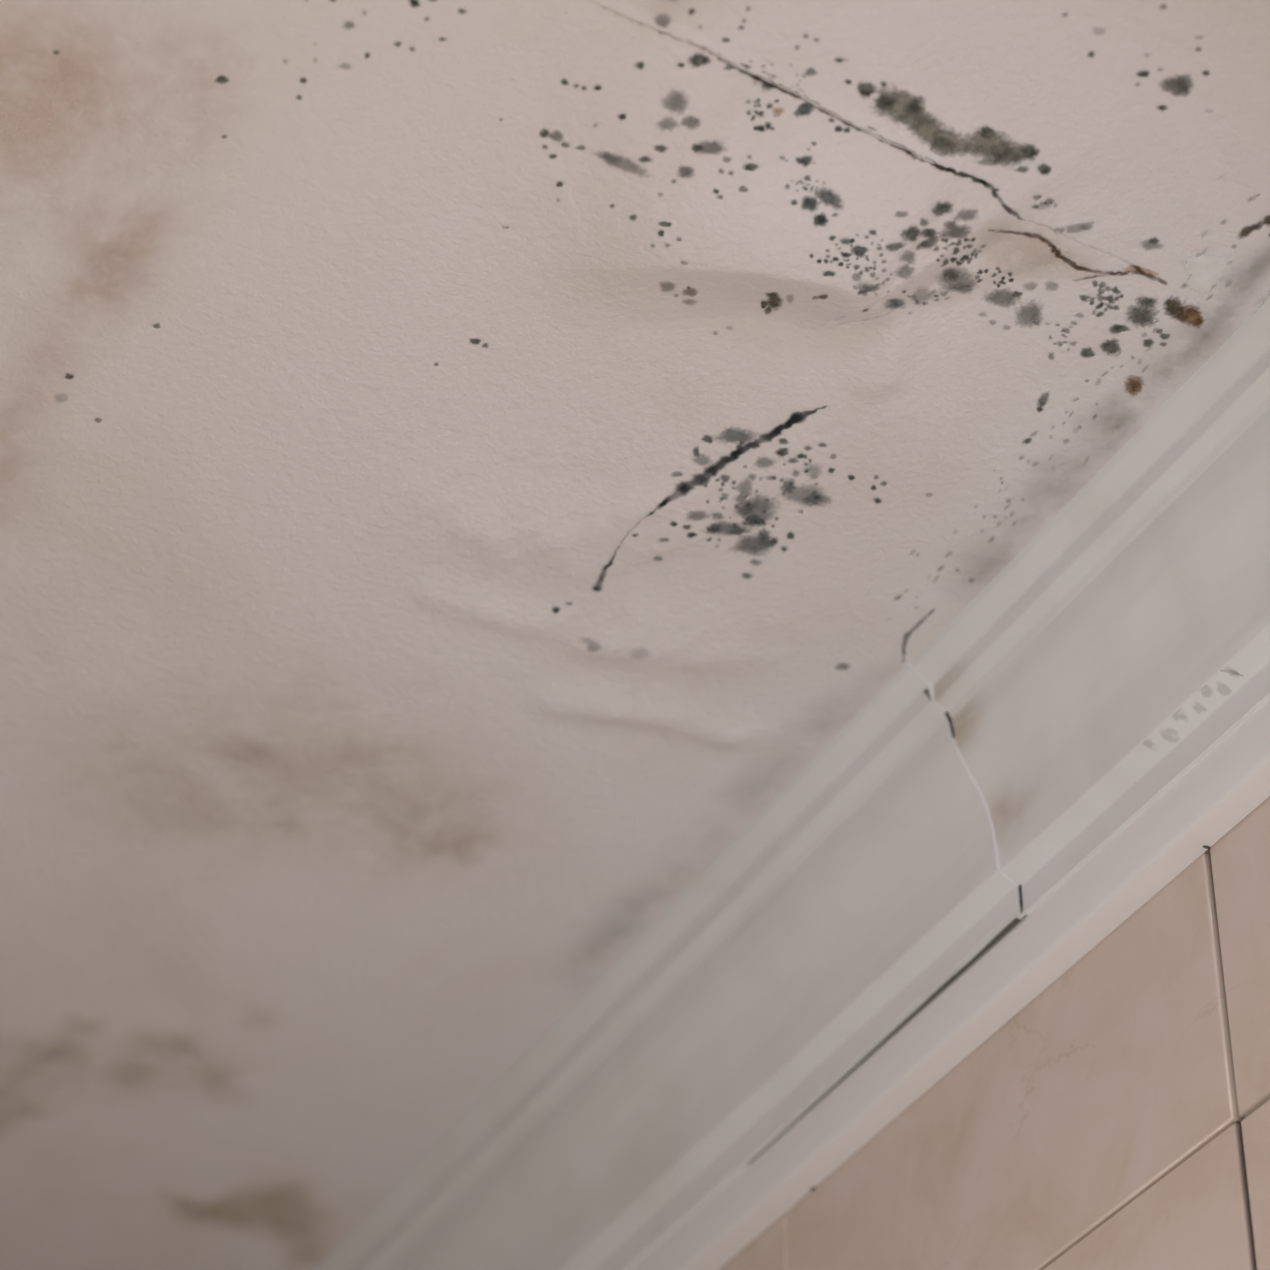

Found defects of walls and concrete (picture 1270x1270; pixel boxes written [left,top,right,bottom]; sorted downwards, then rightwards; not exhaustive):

water stain [678,54,709,67]
water stain [747,77,813,132]
crack [591,0,1166,284]
water stain [846,80,1051,174]
water stain [792,143,1022,306]
water stain [1240,216,1270,237]
water stain [761,293,780,314]
water stain [1081,282,1169,357]
crack [648,407,825,516]
water stain [662,500,794,553]
crack [593,556,614,591]
crack [924,689,955,738]